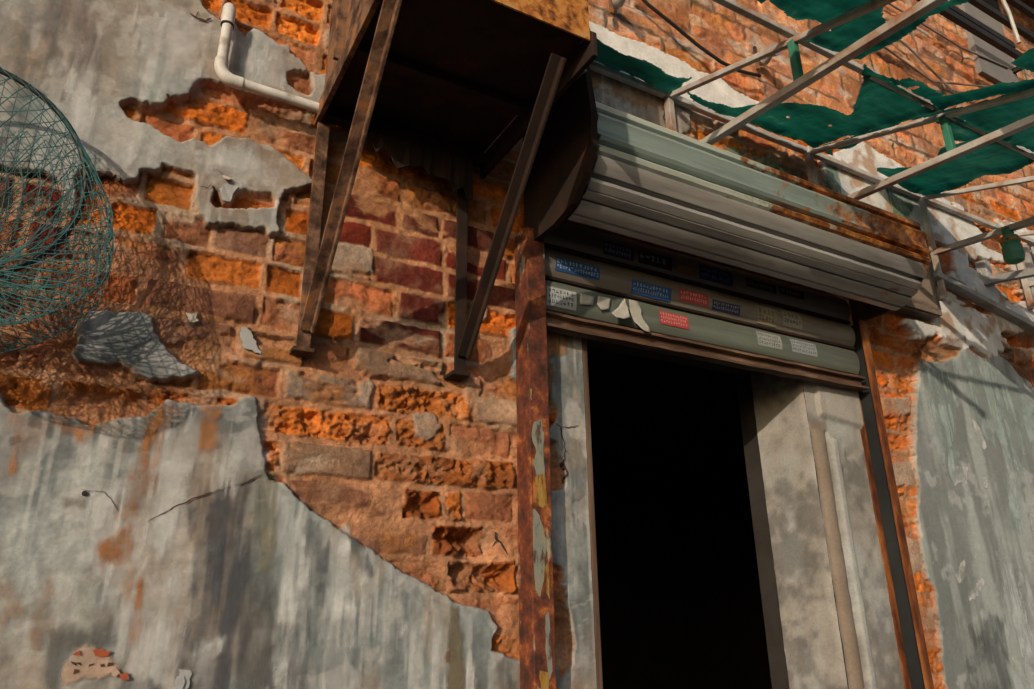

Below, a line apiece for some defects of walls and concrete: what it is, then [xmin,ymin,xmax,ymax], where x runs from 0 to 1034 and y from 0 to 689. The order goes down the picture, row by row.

spalling [0,0,524,659]
spalling [62,647,129,685]
damp [149,462,191,554]
peeling [169,669,192,689]
crack [148,474,263,522]
damp [190,489,374,689]
damp [432,606,474,689]
spalling [531,399,576,689]
crack [551,421,579,483]
spalling [684,110,1034,689]
damp [926,358,1034,524]
damp [974,560,1034,689]